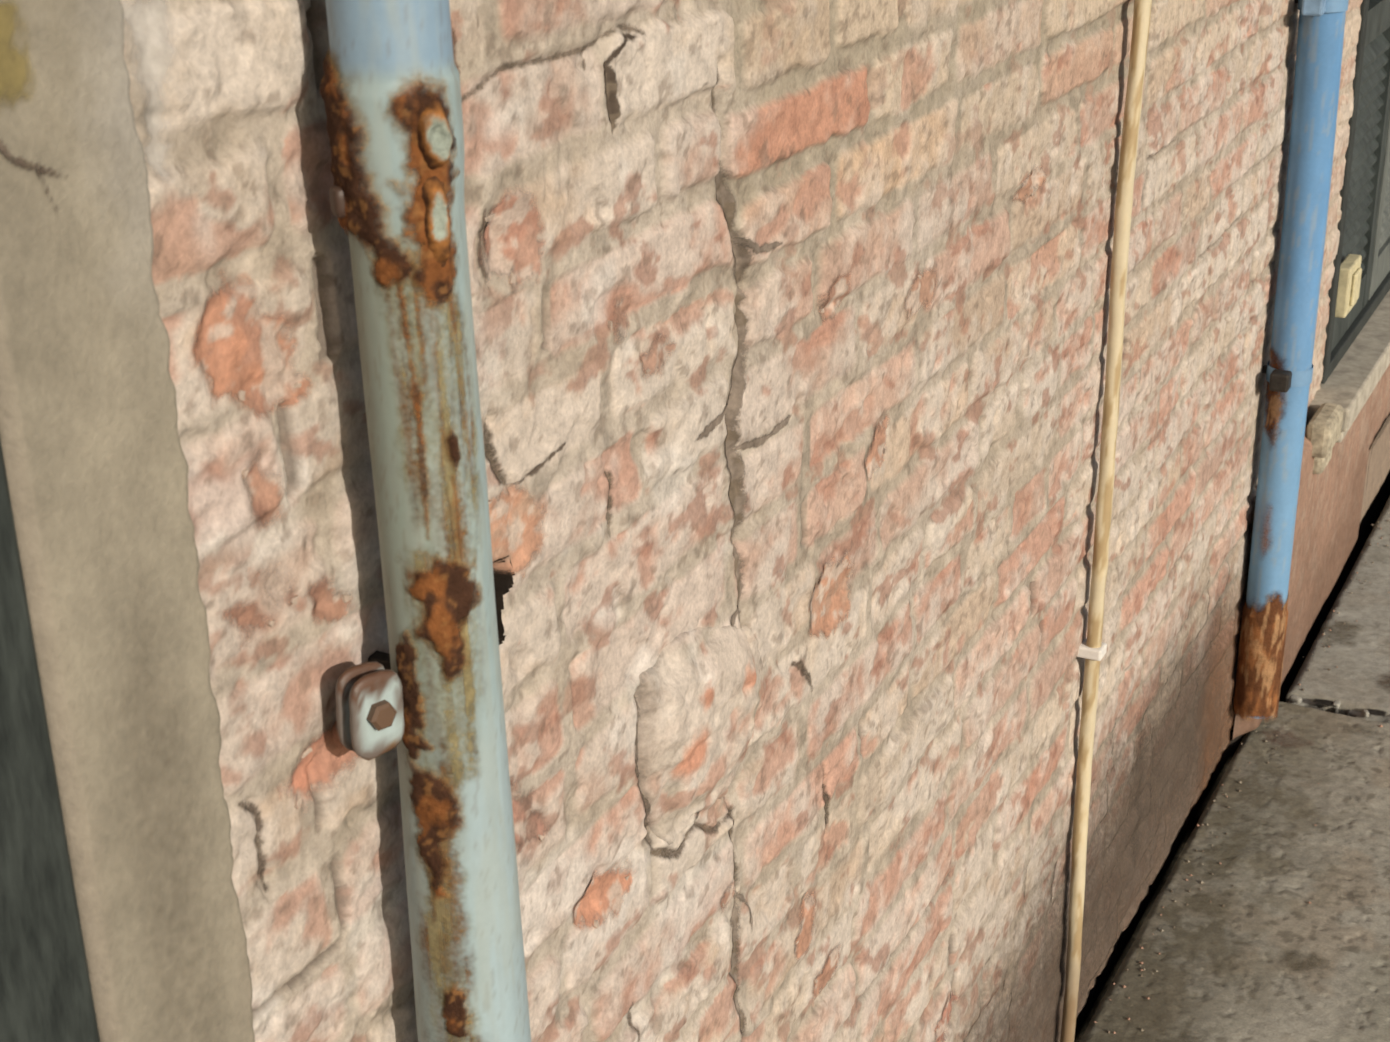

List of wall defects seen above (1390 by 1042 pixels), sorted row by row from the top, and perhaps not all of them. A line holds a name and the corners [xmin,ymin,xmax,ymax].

crack [452,23,644,131]
crack [711,71,719,113]
crack [697,163,791,627]
rust [320,56,482,1042]
rust [1233,594,1288,720]
crack [634,696,753,1033]
crack [628,1005,640,1040]